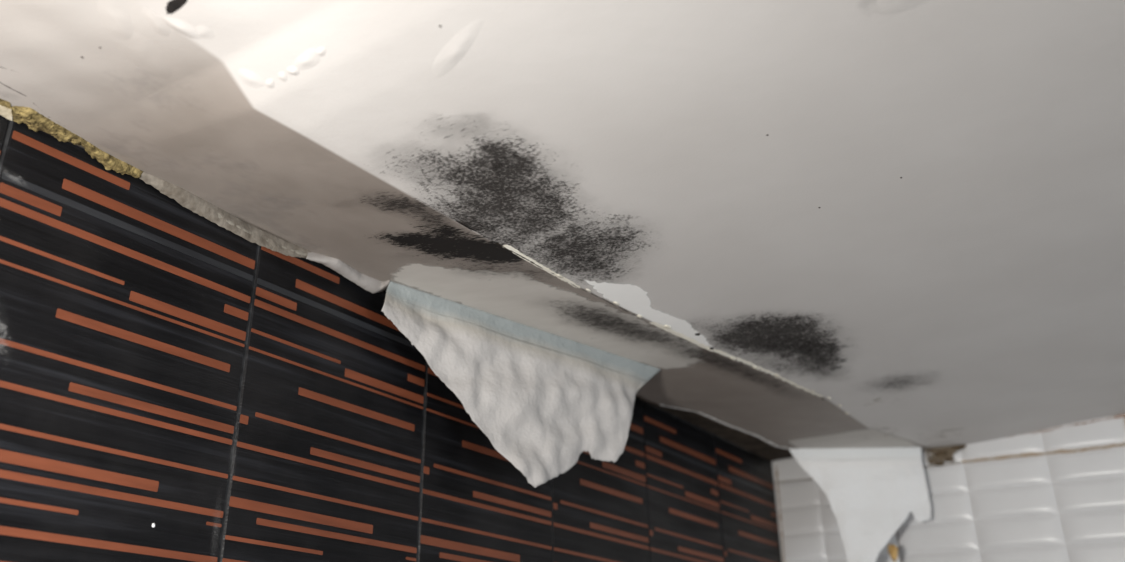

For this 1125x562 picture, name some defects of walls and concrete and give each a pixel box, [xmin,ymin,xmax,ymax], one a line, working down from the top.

mould [363,139,639,280]
peeling [0,99,713,488]
mould [563,304,844,390]
peeling [788,428,931,562]